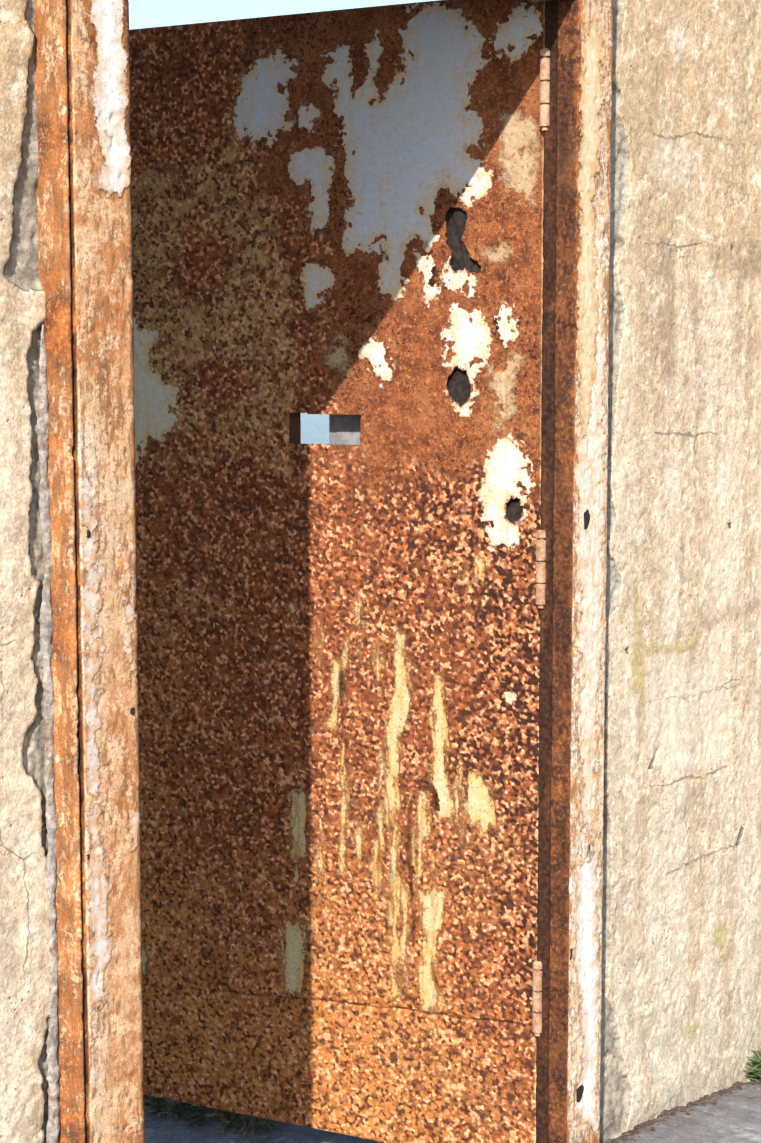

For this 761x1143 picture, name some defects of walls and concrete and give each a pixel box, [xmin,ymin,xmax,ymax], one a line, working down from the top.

flaking render [4,0,43,291]
peeling [222,2,544,559]
crack [654,431,720,456]
peeling [572,0,632,1143]
crack [0,640,13,722]
peeling [504,691,517,705]
crack [649,761,742,876]
crack [0,829,33,974]